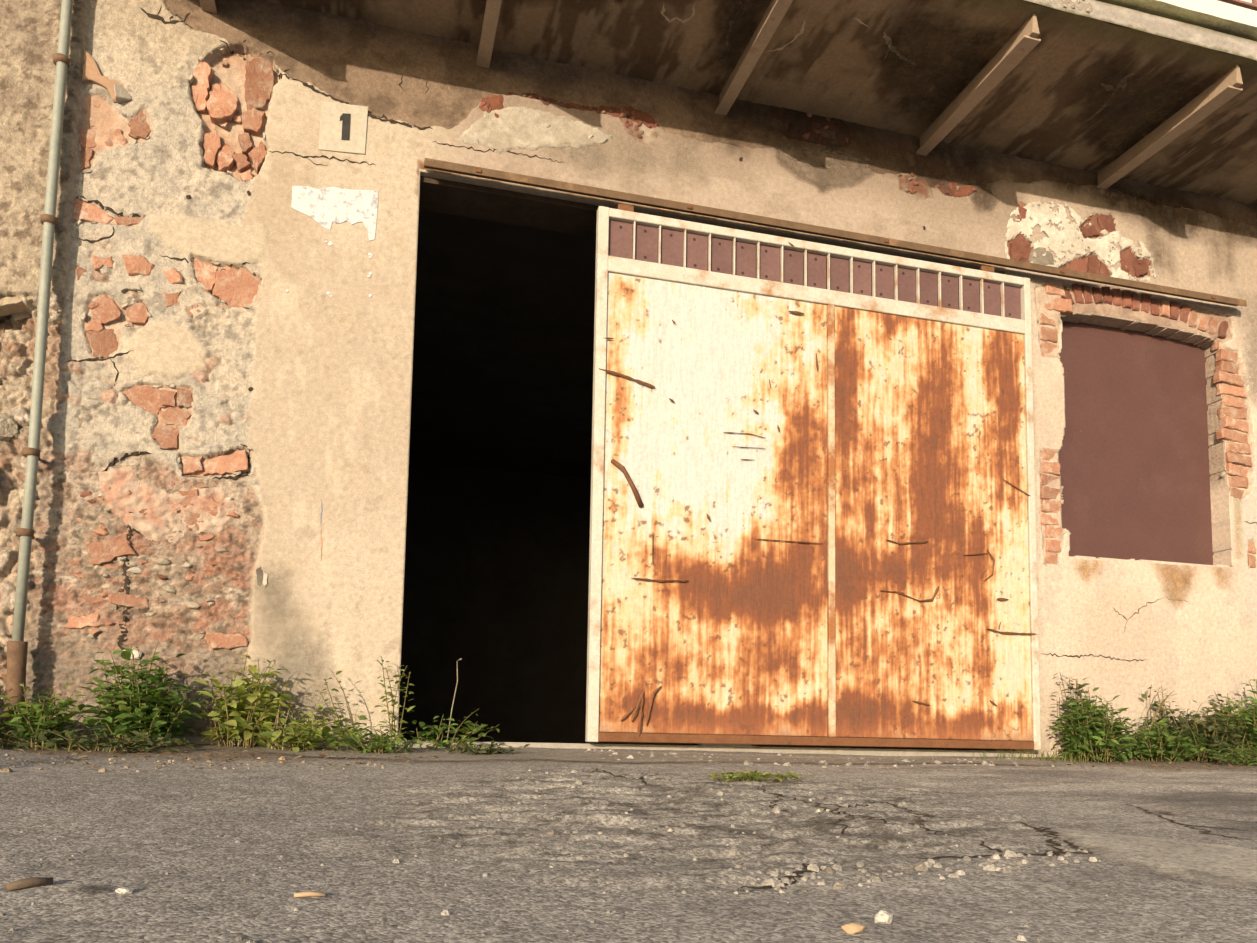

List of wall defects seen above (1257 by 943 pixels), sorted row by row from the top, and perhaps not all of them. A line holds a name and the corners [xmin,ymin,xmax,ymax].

water stain [883,12,1006,121]
flaking render [188,45,282,195]
flaking render [458,92,659,154]
peeling [75,255,114,280]
flaking render [80,280,152,359]
flaking render [162,256,262,317]
flaking render [1005,201,1255,500]
spalling [75,384,252,617]
spalling [65,613,115,639]
spalling [191,631,248,649]